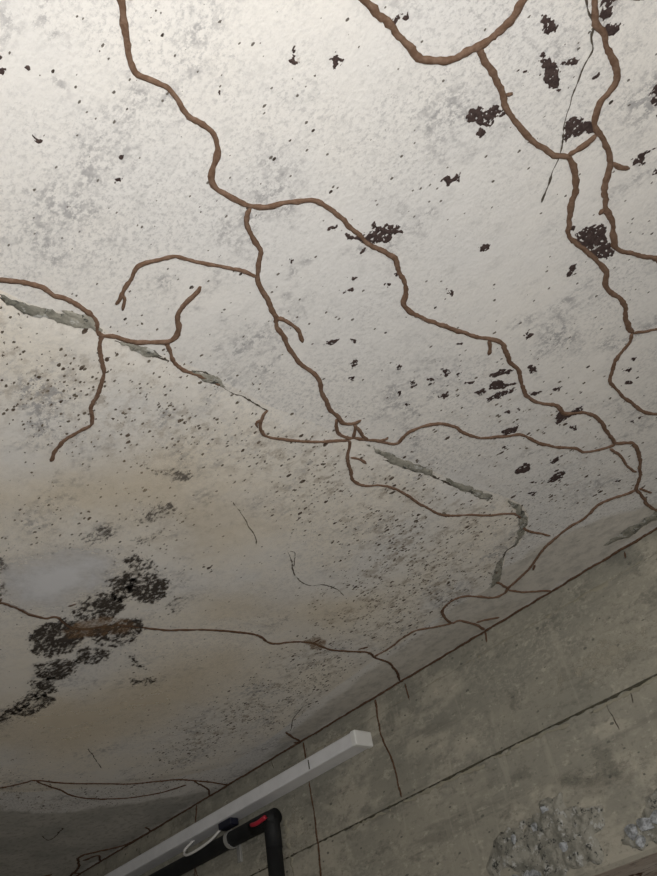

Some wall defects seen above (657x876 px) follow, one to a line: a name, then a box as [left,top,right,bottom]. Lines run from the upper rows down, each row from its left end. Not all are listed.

crack [541,0,594,203]
crack [198,371,267,411]
peeling [515,463,530,474]
peeling [528,457,565,496]
leakage [140,503,176,523]
spalling [603,511,657,546]
crack [288,551,344,596]
leakage [0,519,181,724]
spalling [486,792,605,876]
spalling [622,788,657,851]